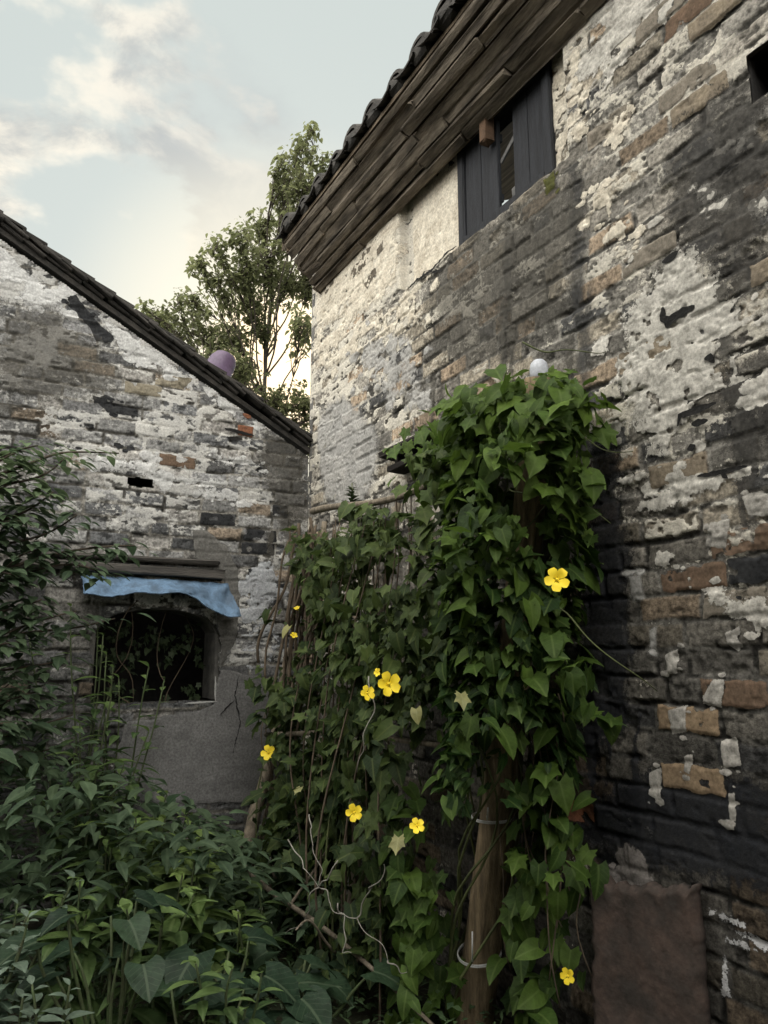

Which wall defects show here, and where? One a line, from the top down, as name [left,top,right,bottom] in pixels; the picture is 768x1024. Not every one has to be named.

peeling [0,247,267,440]
peeling [575,176,768,651]
spalling [273,505,293,518]
peeling [648,628,685,677]
crack [221,677,241,753]
flaking render [648,672,768,830]
spalling [609,842,654,886]